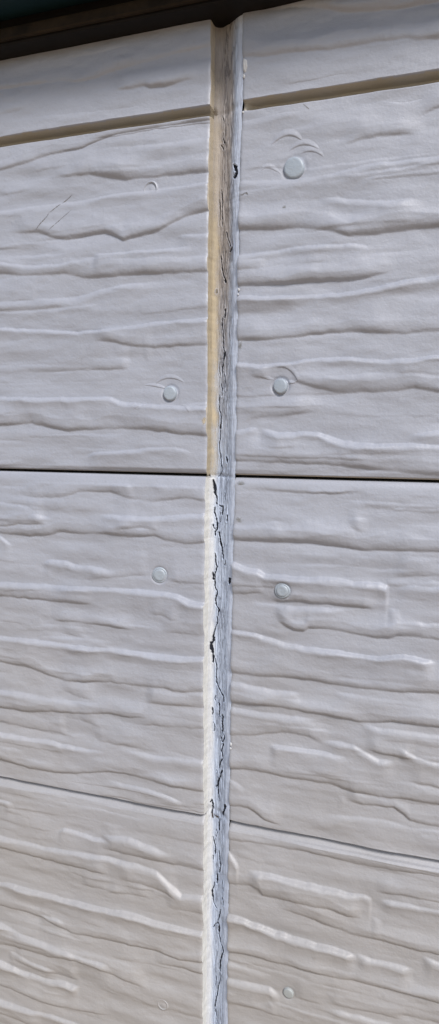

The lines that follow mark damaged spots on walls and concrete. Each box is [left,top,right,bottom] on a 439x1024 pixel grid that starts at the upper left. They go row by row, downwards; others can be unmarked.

crack [220,193,231,281]
crack [210,319,228,1016]